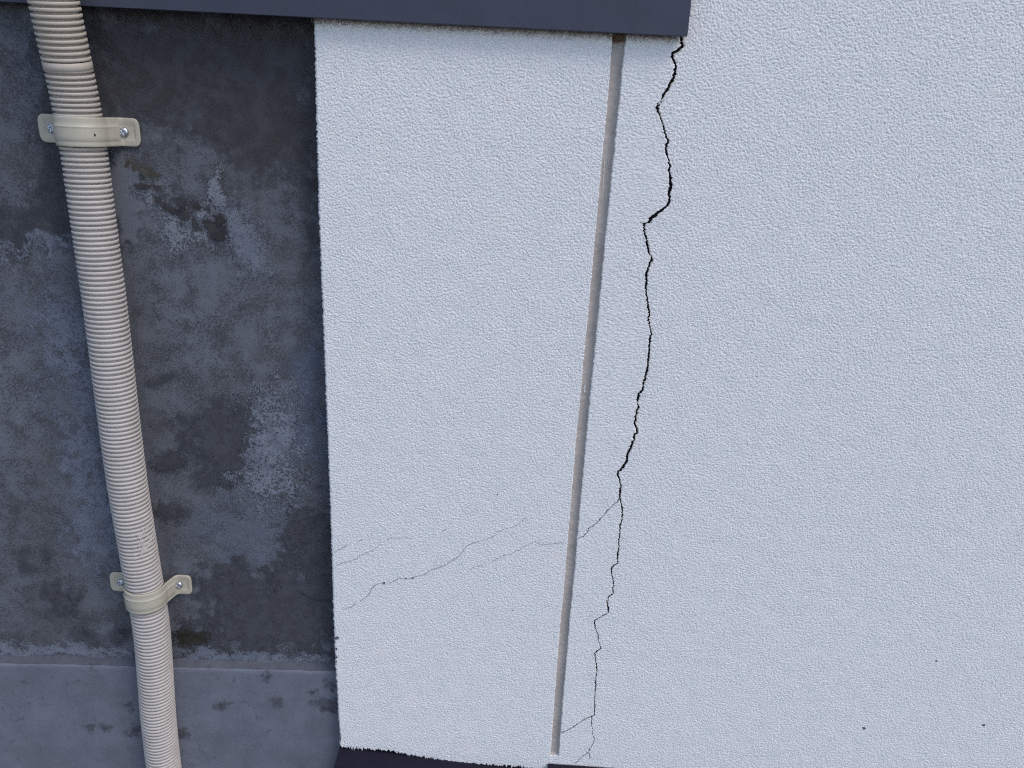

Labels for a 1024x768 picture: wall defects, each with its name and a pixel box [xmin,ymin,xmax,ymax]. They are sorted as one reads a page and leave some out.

leakage [26,31,52,116]
leakage [0,140,134,659]
leakage [108,146,335,683]
crack [296,37,685,763]